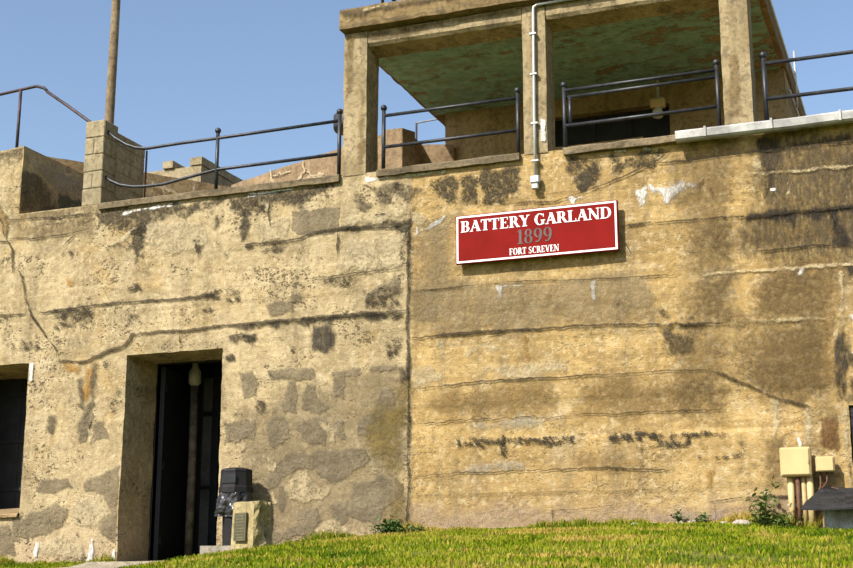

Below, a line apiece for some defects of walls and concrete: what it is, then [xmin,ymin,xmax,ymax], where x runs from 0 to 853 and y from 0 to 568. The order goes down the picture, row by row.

water stain [341,216,413,239]
water stain [365,170,446,204]
water stain [635,180,696,204]
crack [512,140,853,204]
crack [622,205,853,261]
water stain [740,130,853,275]
water stain [418,224,649,331]
water stain [838,265,853,320]
crack [0,163,813,523]
water stain [662,316,702,354]
water stain [833,325,853,399]